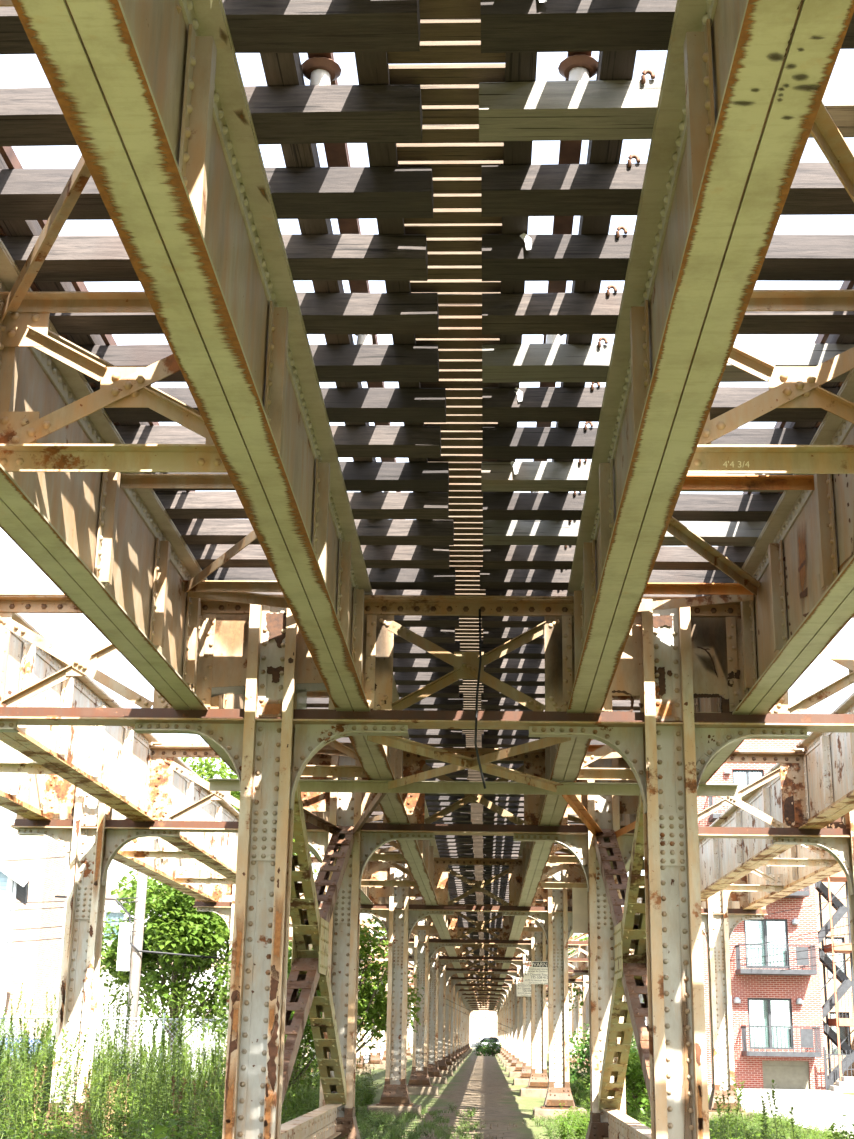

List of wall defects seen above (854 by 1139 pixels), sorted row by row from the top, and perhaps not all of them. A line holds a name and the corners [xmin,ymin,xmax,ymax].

rust [0,0,369,708]
rust [568,0,854,711]
peeling [266,612,294,683]
peeling [653,615,673,628]
peeling [654,666,673,696]
rust [234,922,256,993]
rust [273,905,283,963]
peeling [225,986,241,1123]
rust [256,1007,275,1042]
rust [224,1075,235,1139]
rust [264,1088,273,1139]